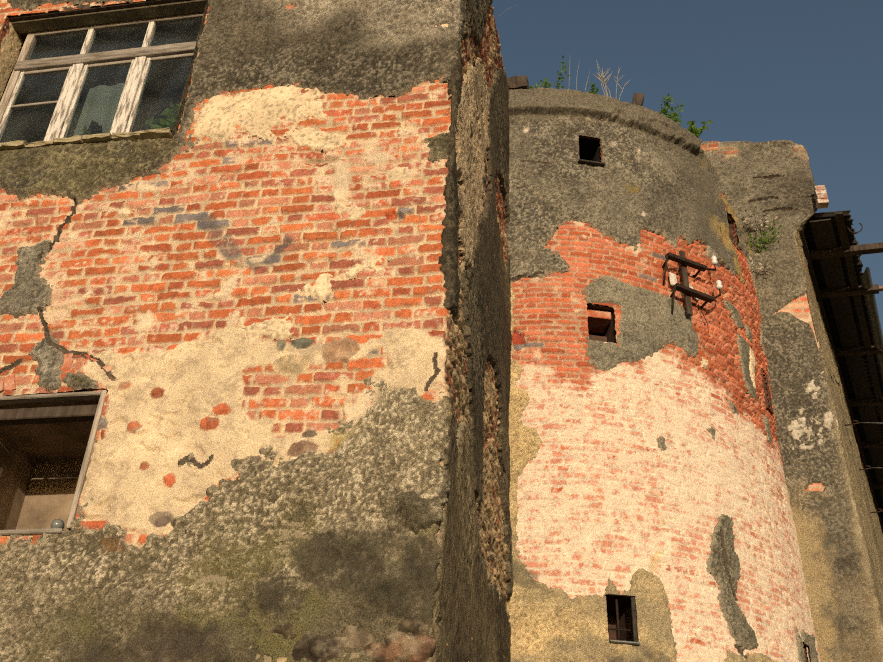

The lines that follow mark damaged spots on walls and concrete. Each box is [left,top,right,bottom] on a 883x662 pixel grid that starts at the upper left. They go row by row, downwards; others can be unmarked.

peeling [505,87,758,296]
crack [37,198,77,260]
crack [0,358,22,374]
crack [37,306,116,380]
peeling [0,0,677,662]
peeling [582,276,709,371]
peeling [722,300,766,400]
spalling [772,293,822,360]
peeling [802,371,824,399]
peeling [787,408,839,450]
spalling [805,483,826,492]
peeling [706,514,777,662]